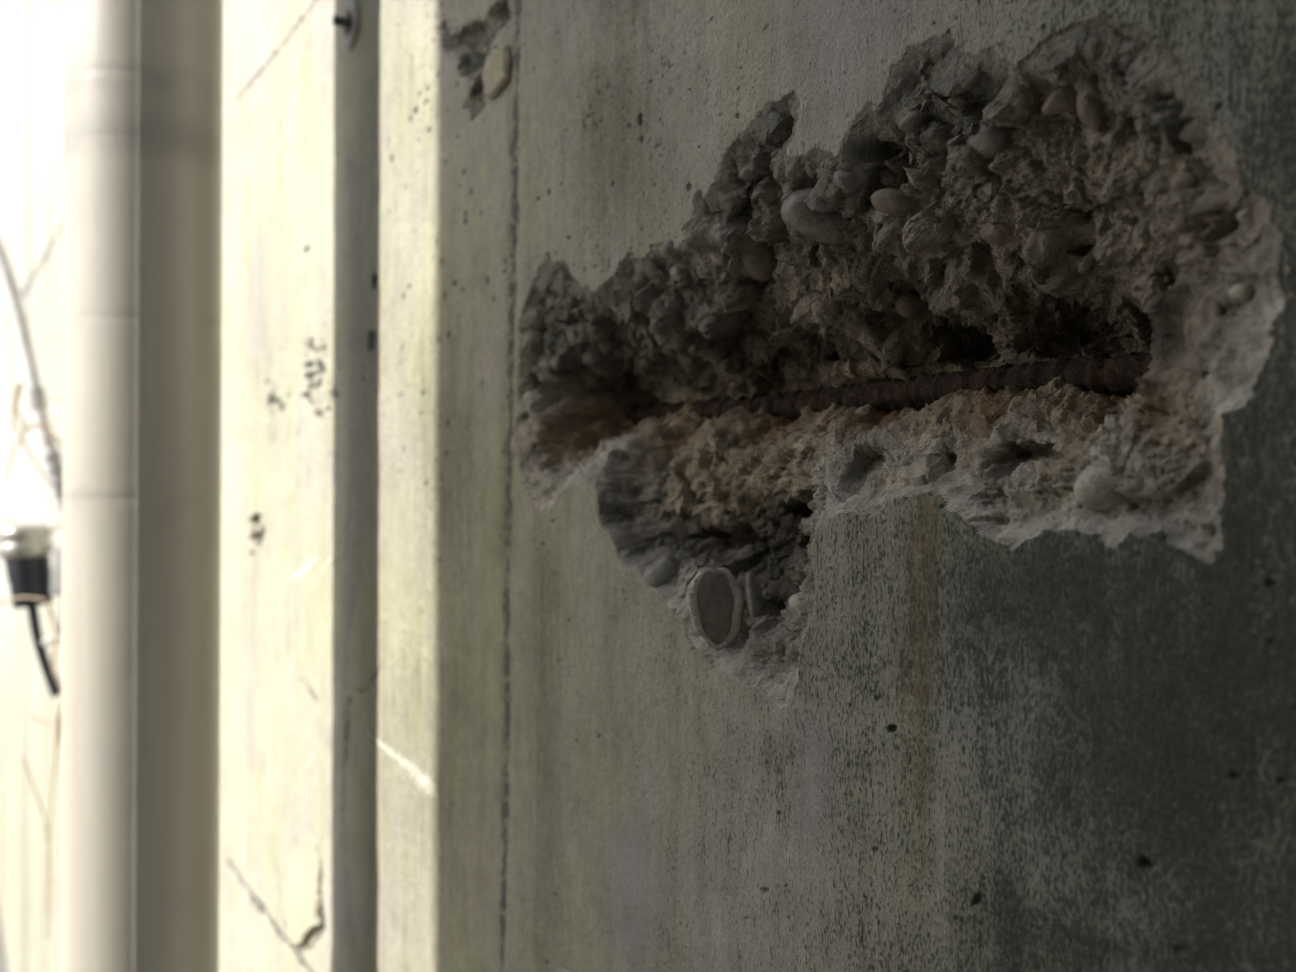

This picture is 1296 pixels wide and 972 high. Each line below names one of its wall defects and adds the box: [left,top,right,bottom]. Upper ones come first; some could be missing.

spalling [434,0,512,119]
spalling [513,14,1292,709]